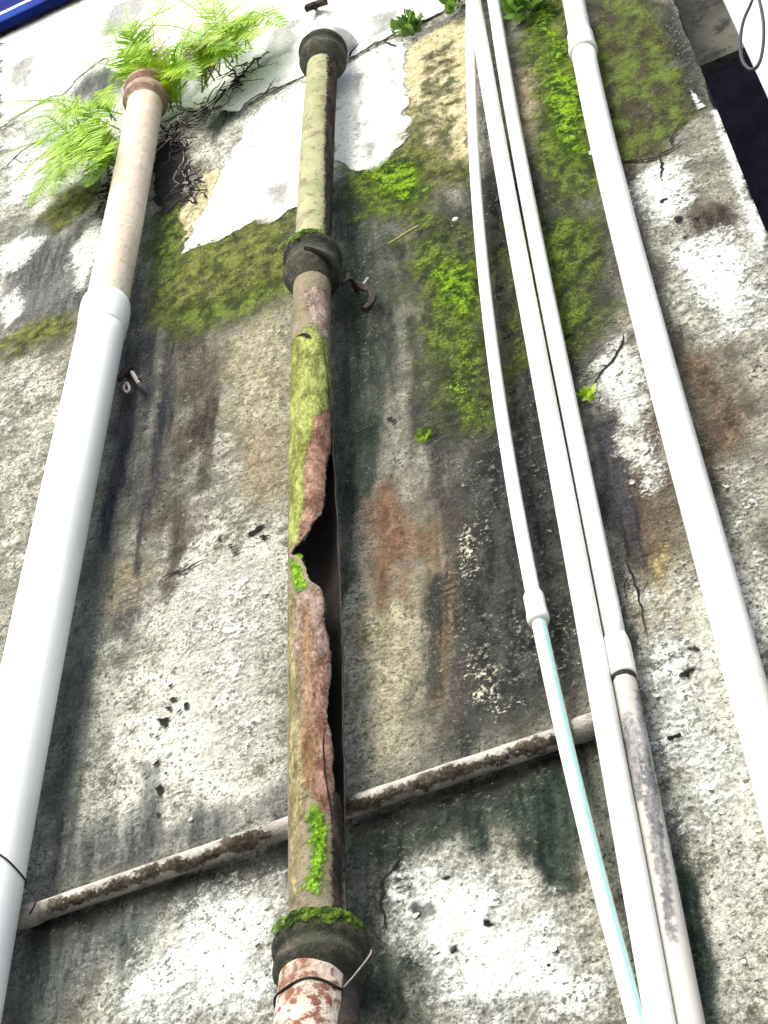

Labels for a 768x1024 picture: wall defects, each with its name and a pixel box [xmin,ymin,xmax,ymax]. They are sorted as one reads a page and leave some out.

crack [347,12,442,59]
peeling [0,0,477,254]
crack [621,125,682,179]
damp [526,142,650,617]
crack [594,328,628,384]
damp [331,143,583,766]
damp [47,193,289,896]
corrosion [363,475,453,621]
crack [620,518,648,639]
damp [576,743,600,795]
crack [379,841,400,933]
damp [346,751,579,1024]